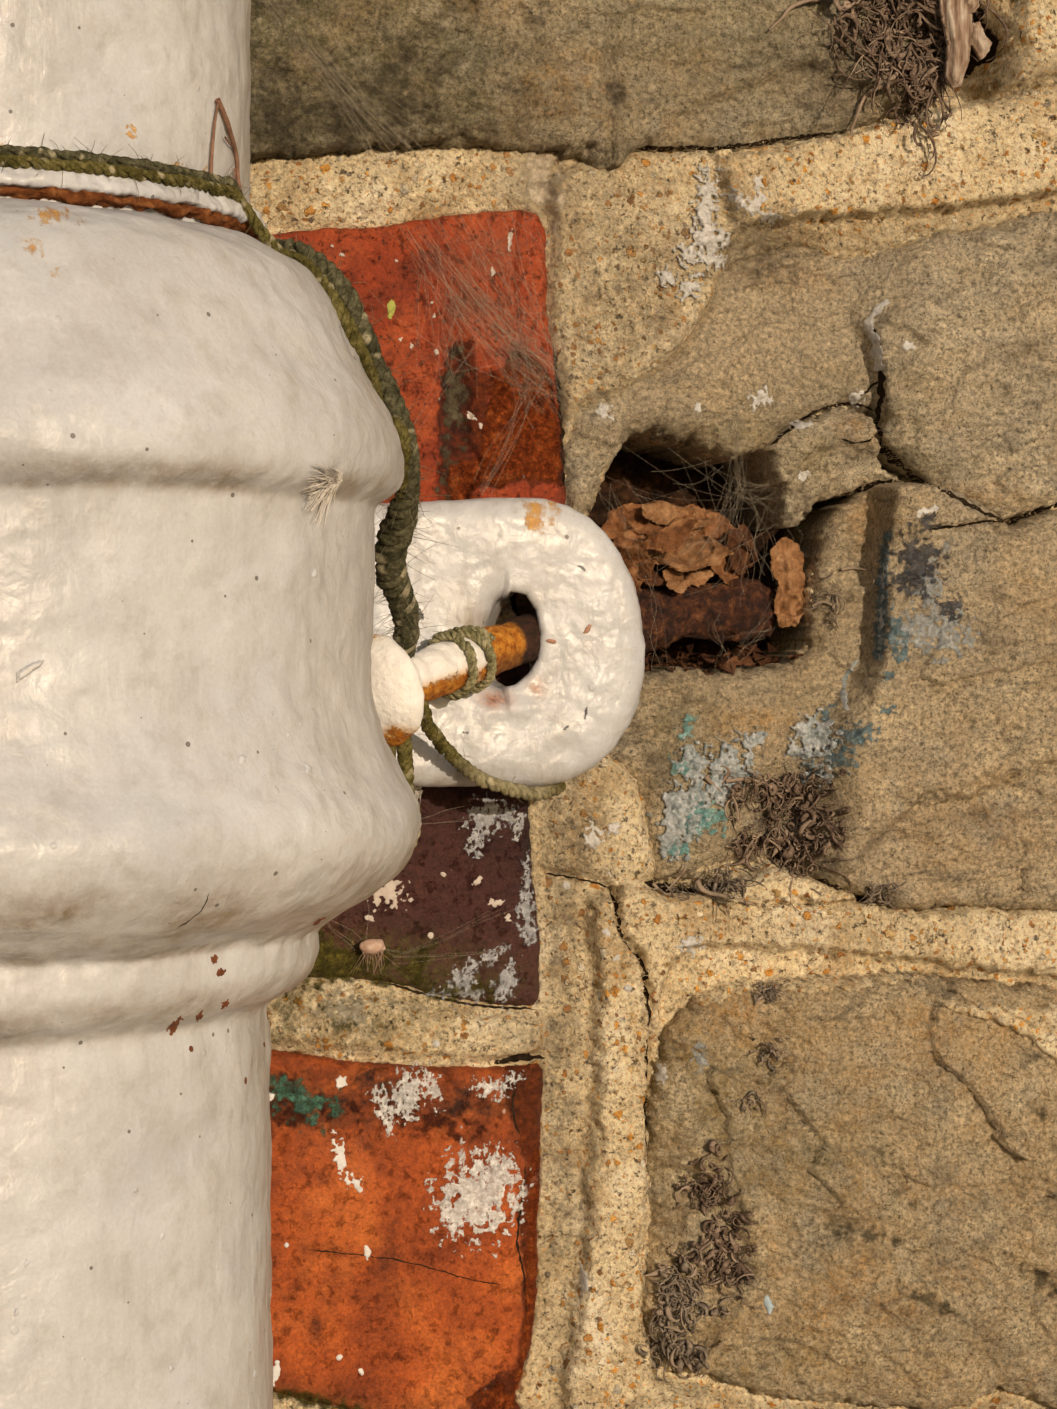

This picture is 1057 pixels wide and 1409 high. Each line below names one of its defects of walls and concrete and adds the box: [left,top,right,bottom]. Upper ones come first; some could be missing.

crack [771,327,1057,530]